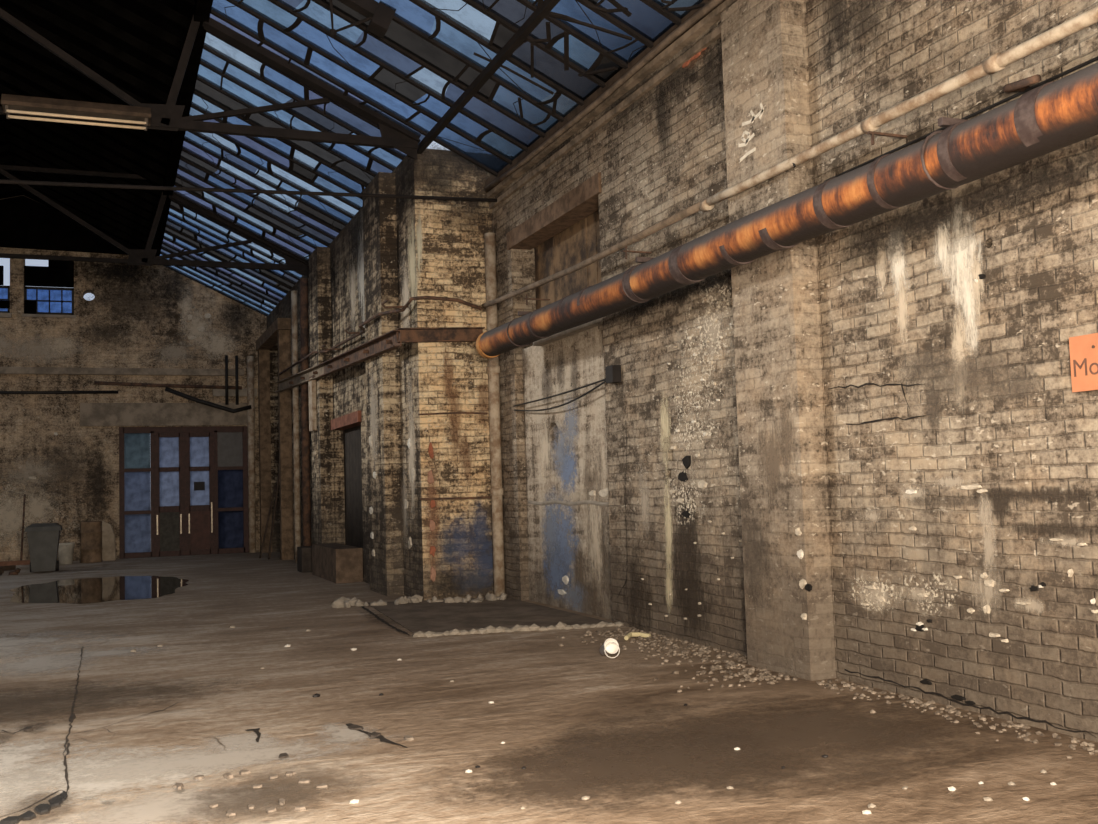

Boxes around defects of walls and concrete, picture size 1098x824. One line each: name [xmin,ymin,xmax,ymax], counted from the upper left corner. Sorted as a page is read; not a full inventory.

leakage [904,206,1033,427]
leakage [661,398,671,468]
peeling [540,399,609,608]
leakage [664,484,710,631]
leakage [915,487,1097,520]
leakage [1015,523,1098,537]
leakage [466,702,961,808]